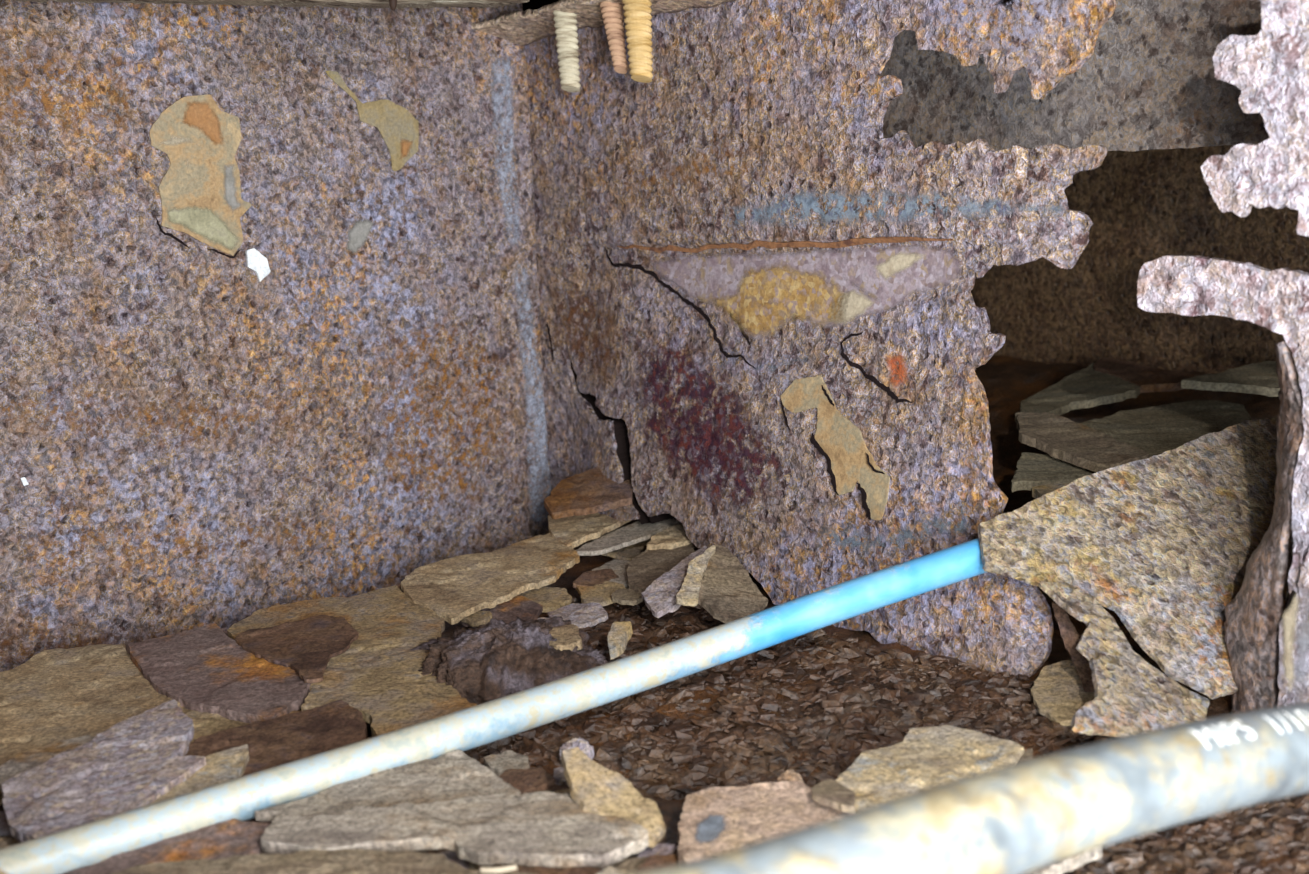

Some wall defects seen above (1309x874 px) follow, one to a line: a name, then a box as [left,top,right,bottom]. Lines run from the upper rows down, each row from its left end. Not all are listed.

rust [0,57,129,127]
peeling [325,71,419,171]
peeling [149,94,271,282]
rust [119,402,259,441]
rust [384,320,502,499]
rust [556,290,615,366]
crack [547,322,674,525]
rust [639,347,778,504]
spalling [781,375,890,520]
crack [795,318,913,403]
crack [1282,589,1298,617]
peeling [1284,584,1309,698]